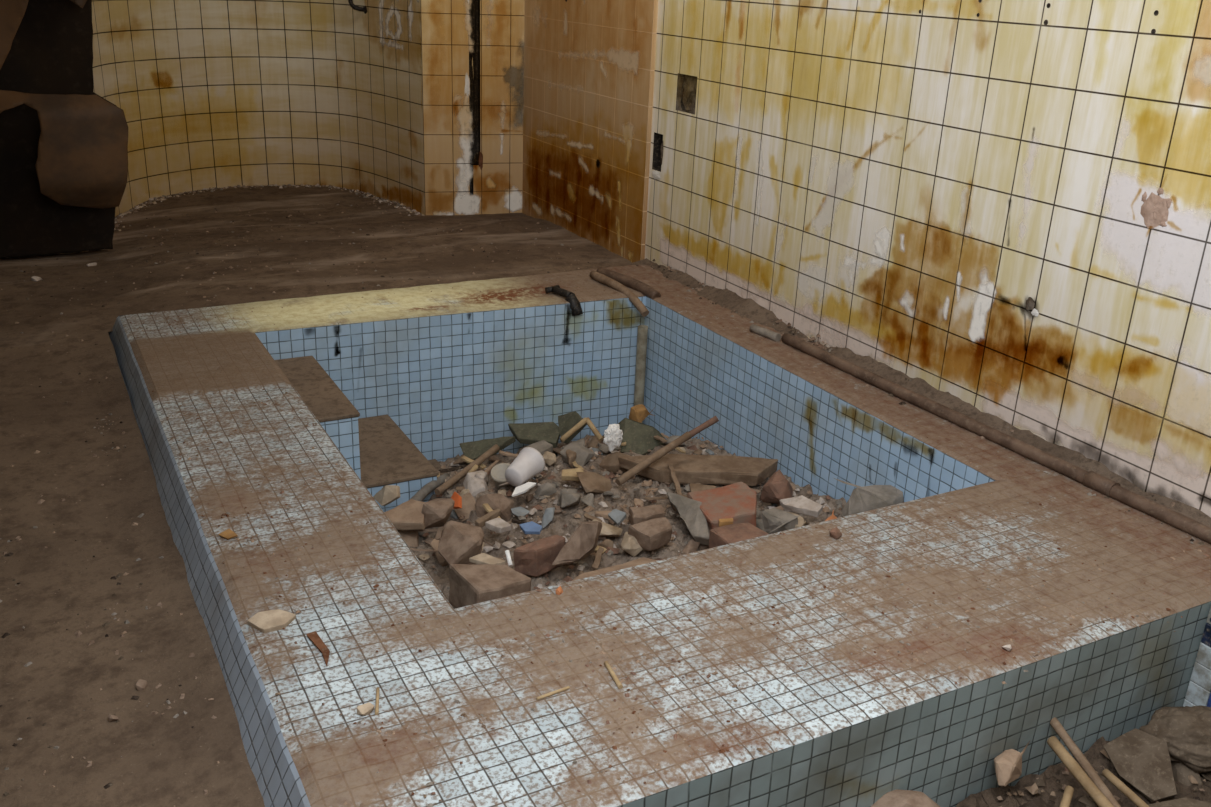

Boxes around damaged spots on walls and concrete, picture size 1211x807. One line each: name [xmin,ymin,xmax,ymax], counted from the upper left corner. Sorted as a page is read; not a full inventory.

peeling [465,0,473,51]
peeling [499,43,524,154]
peeling [433,72,571,220]
peeling [537,131,593,171]
peeling [589,181,632,262]
spalling [1140,187,1172,229]